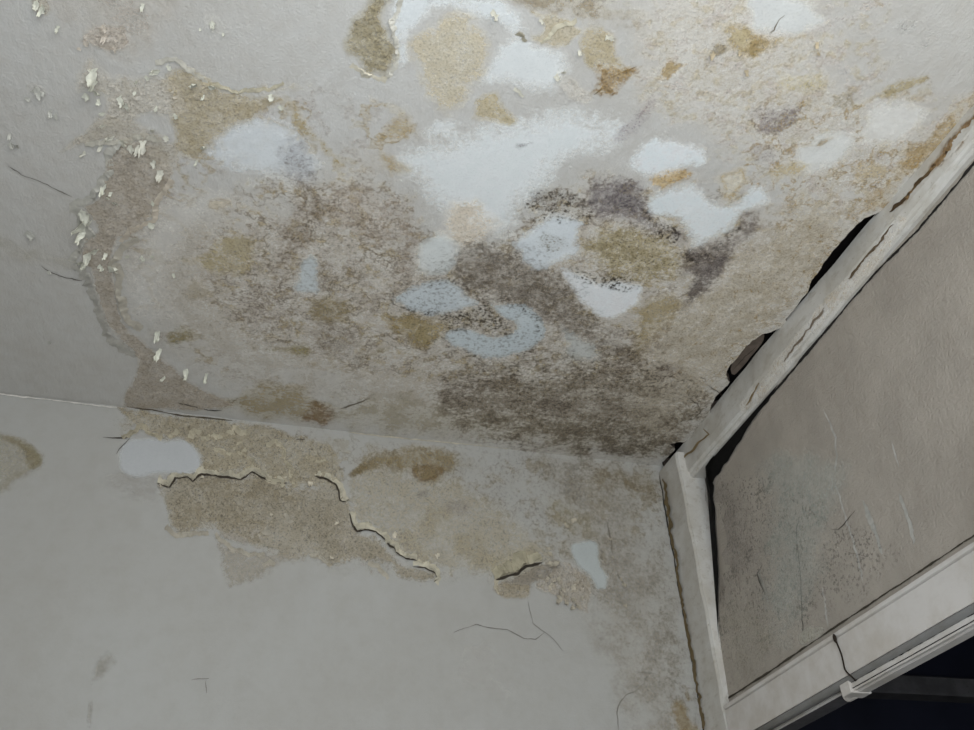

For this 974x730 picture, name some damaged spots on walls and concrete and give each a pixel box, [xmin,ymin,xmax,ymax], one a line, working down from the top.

water stain [524,0,596,17]
peeling [68,57,441,585]
water stain [228,386,330,424]
water stain [391,208,604,347]
water stain [438,121,955,455]
spalling [710,329,778,412]
peeling [784,307,825,362]
spalling [796,214,875,307]
peeling [848,224,894,279]
crack [455,603,563,651]
crack [660,480,698,698]
crack [728,505,974,699]